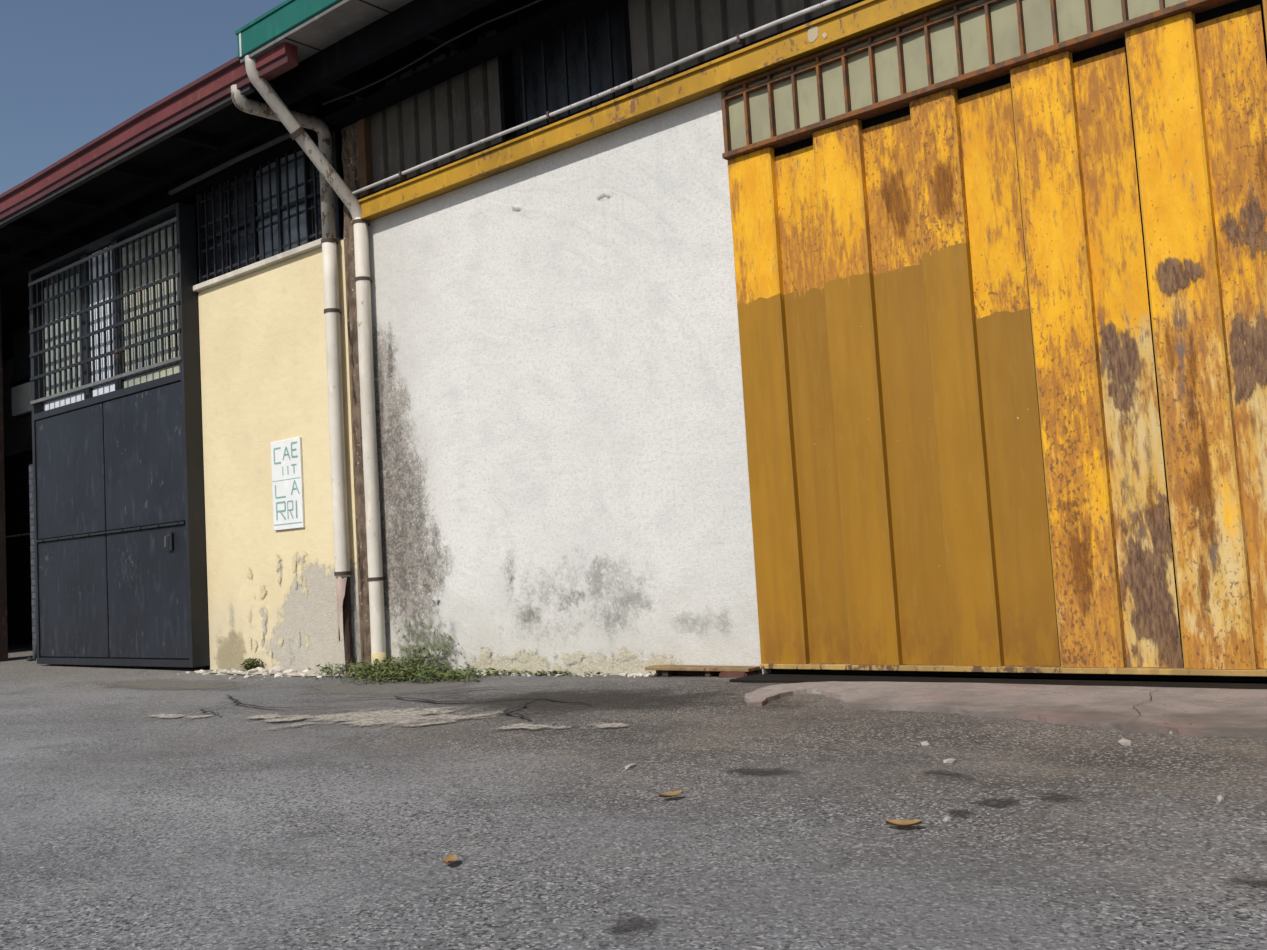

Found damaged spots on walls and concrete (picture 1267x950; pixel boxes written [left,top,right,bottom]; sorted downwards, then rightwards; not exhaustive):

rust [883,169,909,233]
rust [930,162,952,210]
rust [1221,143,1267,259]
rust [1099,322,1141,455]
rust [1230,311,1267,407]
water stain [372,332,447,625]
peeling [247,551,361,672]
rust [1120,446,1183,668]